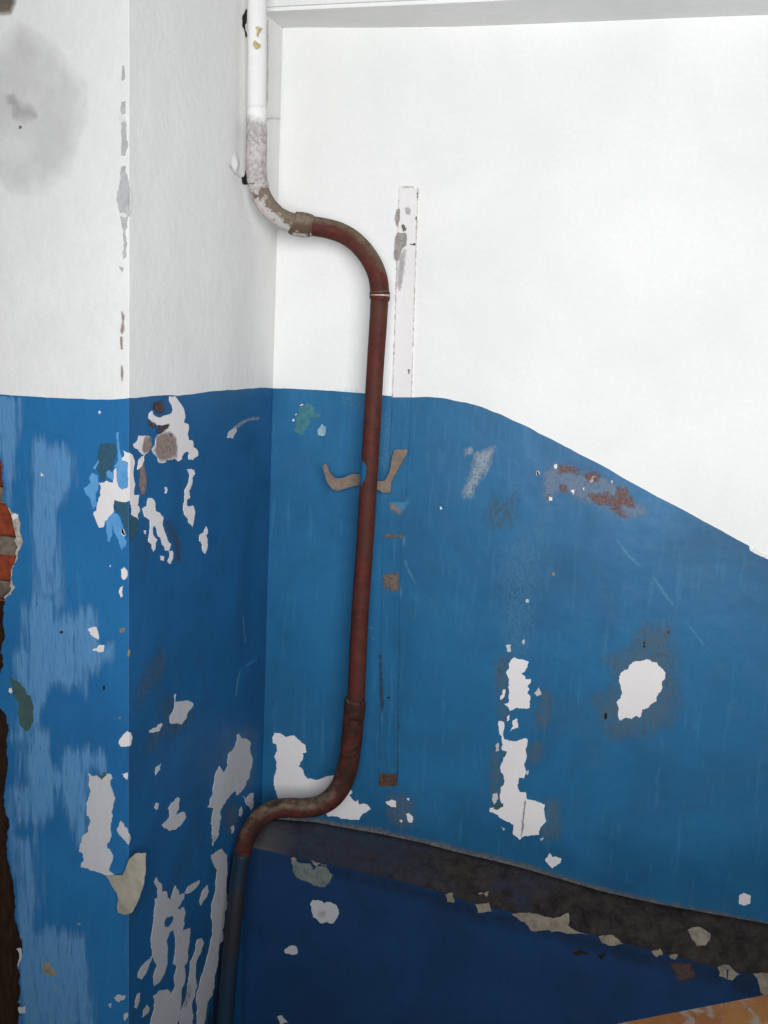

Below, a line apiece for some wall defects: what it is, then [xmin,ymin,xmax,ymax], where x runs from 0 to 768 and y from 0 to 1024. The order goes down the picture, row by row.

peeling [84,396,208,564]
corrosion [536,463,645,517]
flaking render [0,460,23,602]
peeling [109,565,128,598]
peeling [119,731,132,747]
peeling [149,694,194,733]
peeling [272,733,334,798]
peeling [489,639,558,841]
peeling [595,628,674,738]
peeling [326,790,370,820]
peeling [79,734,254,1024]
peeling [512,912,623,959]